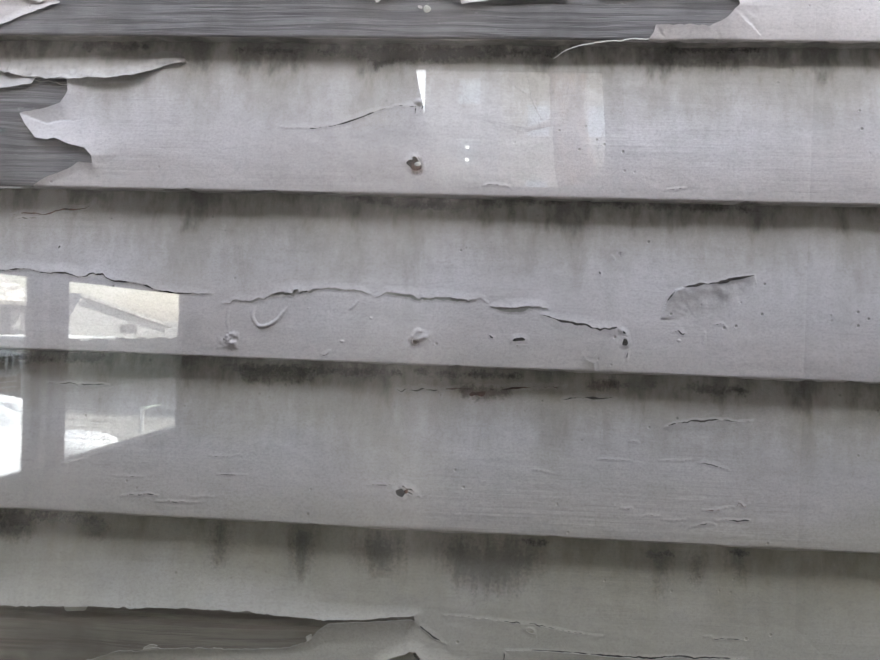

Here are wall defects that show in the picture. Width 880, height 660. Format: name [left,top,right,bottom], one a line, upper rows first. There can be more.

peeling [0,0,766,59]
peeling [0,51,188,188]
damp [359,196,535,212]
damp [650,203,727,211]
crack [0,259,632,363]
peeling [660,273,758,345]
damp [5,352,104,363]
peeling [390,480,422,503]
peeling [0,560,448,660]